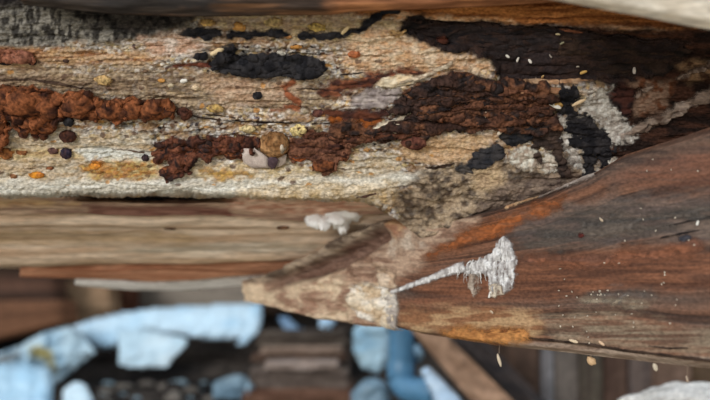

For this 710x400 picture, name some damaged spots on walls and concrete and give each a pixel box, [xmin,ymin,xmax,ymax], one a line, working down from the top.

rust [317,67,424,129]
damp [178,10,692,209]
rust [199,166,253,182]
damp [304,211,362,235]
damp [390,236,517,298]